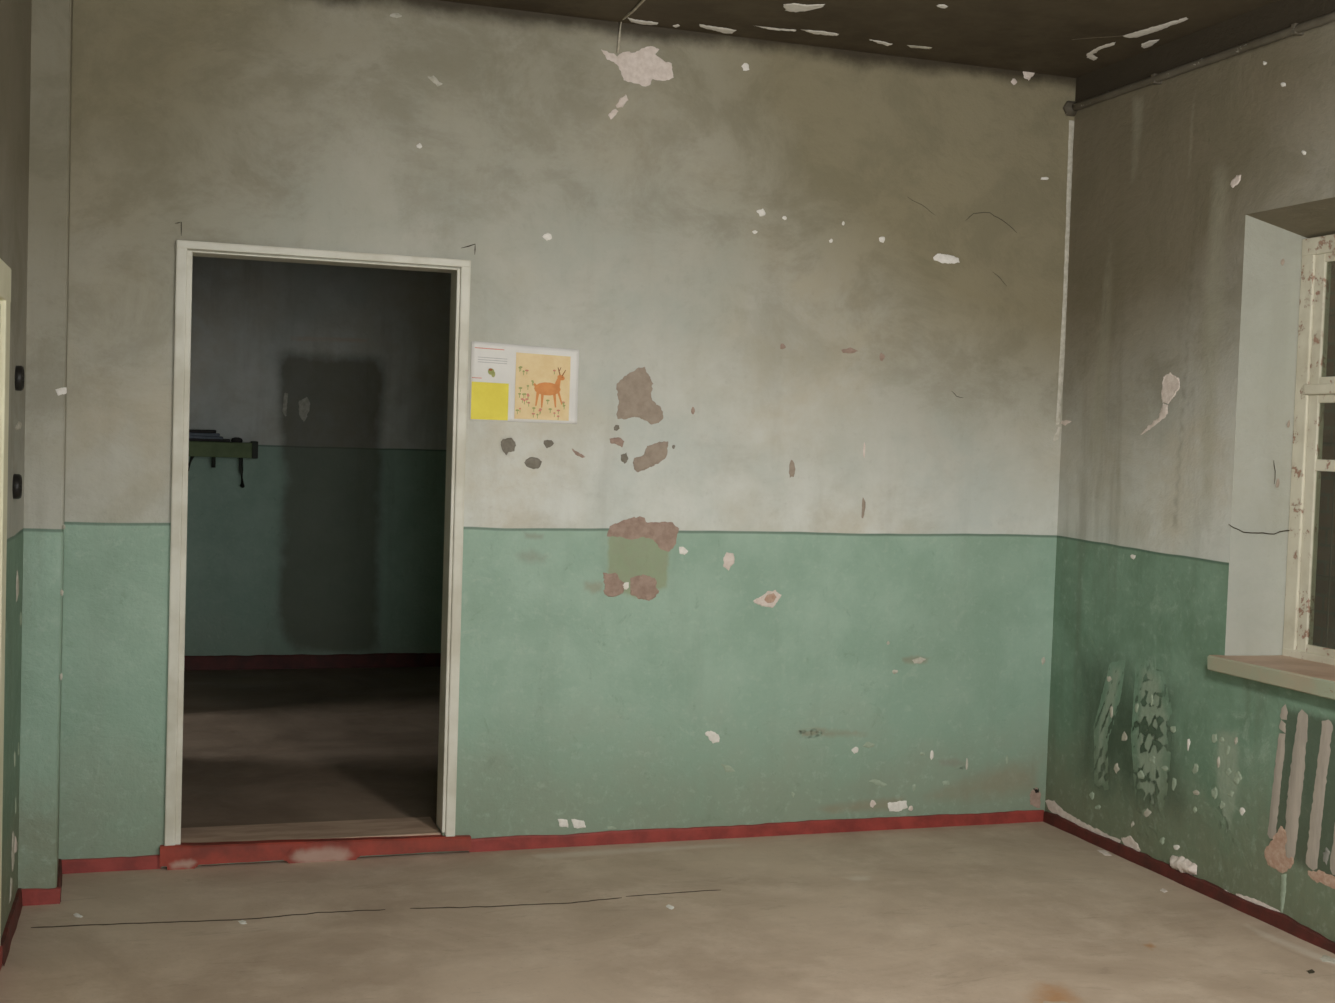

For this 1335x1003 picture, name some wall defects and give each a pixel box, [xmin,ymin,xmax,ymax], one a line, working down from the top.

peeling [699,24,736,34]
peeling [758,26,839,36]
peeling [783,3,825,12]
peeling [1072,17,1188,61]
flaking render [602,46,674,119]
flaking render [610,367,675,472]
peeling [1140,372,1180,435]
water stain [793,614,1246,863]
flaking render [1030,787,1152,852]
water stain [1055,827,1171,896]
flaking render [1160,837,1197,875]
flaking render [1225,826,1294,913]